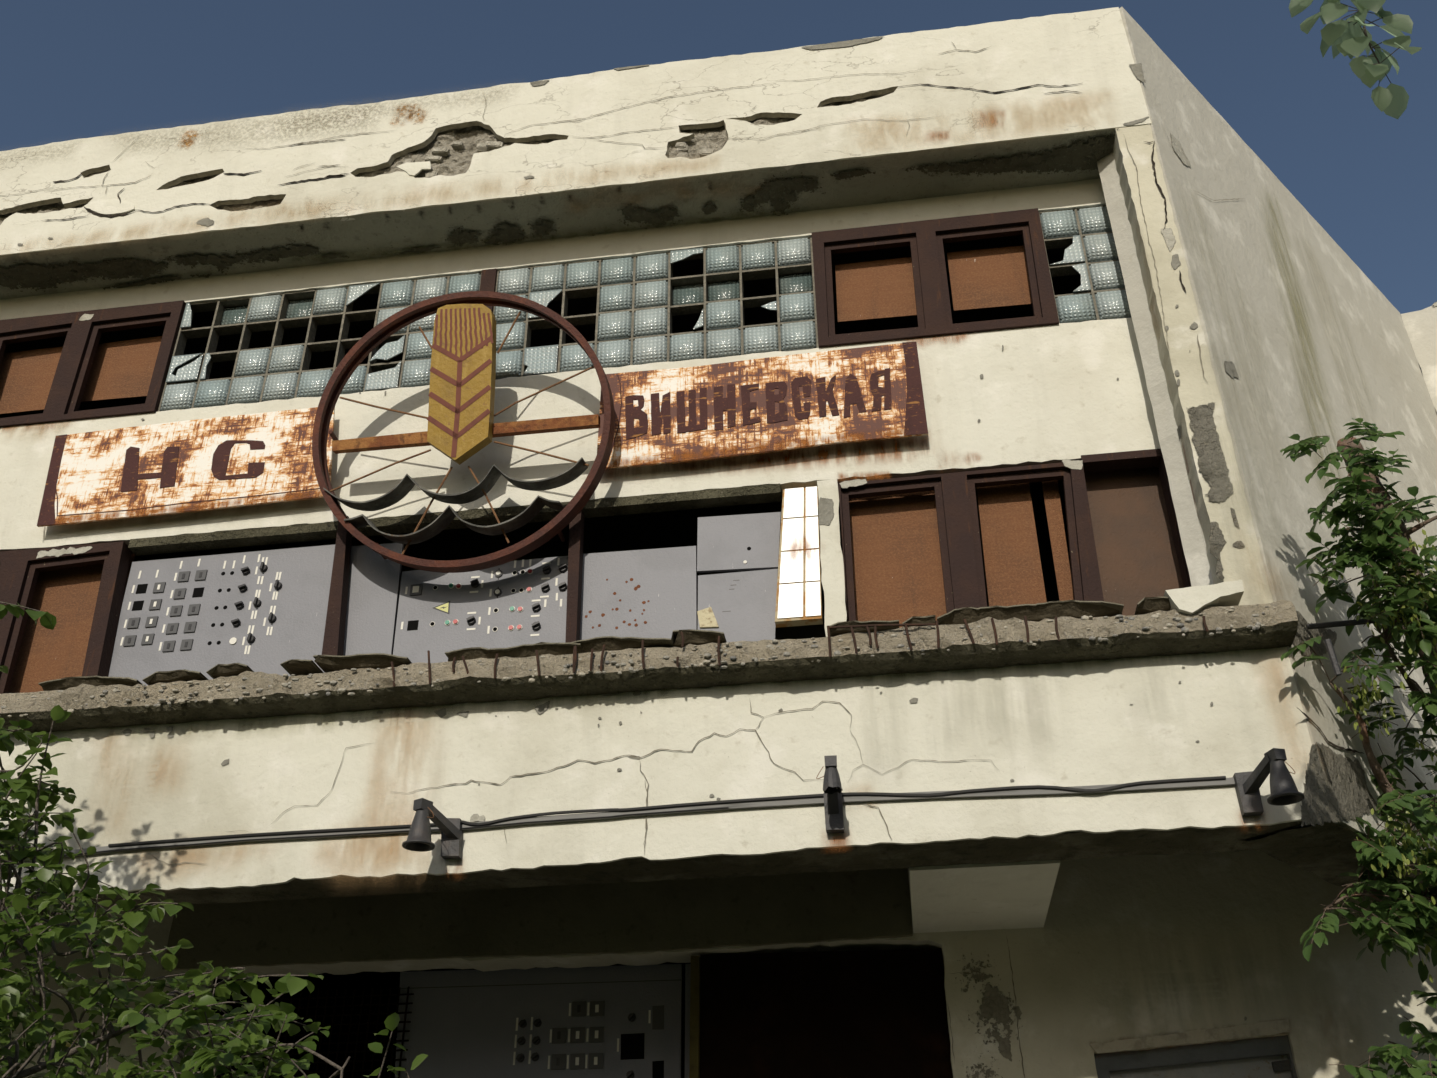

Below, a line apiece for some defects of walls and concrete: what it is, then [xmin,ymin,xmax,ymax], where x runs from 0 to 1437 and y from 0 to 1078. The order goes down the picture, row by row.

crack [483,45,1082,149]
spalling [817,86,898,107]
spalling [81,165,110,178]
spalling [157,169,224,190]
spalling [351,121,568,178]
spalling [665,112,802,159]
spalling [0,197,93,225]
spalling [197,194,286,226]
crack [1123,134,1208,383]
peeling [1177,402,1245,580]
crack [225,742,377,841]
crack [390,701,995,852]